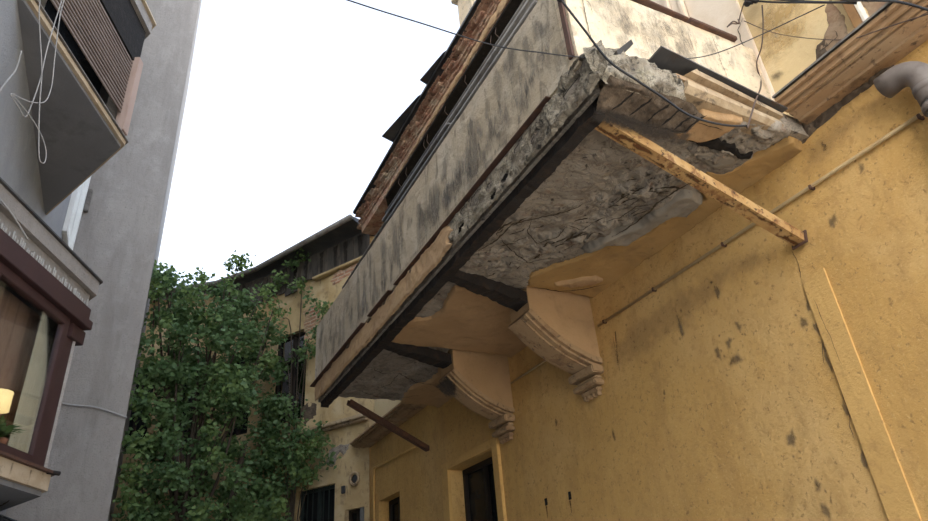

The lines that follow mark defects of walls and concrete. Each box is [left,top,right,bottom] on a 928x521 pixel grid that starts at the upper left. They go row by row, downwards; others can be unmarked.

flaking render [816,0,848,60]
flaking render [861,2,887,16]
spalling [801,65,894,144]
spalling [448,40,792,289]
rust [597,126,665,168]
flaking render [540,276,603,292]
spalling [338,349,438,401]
crack [807,300,867,467]